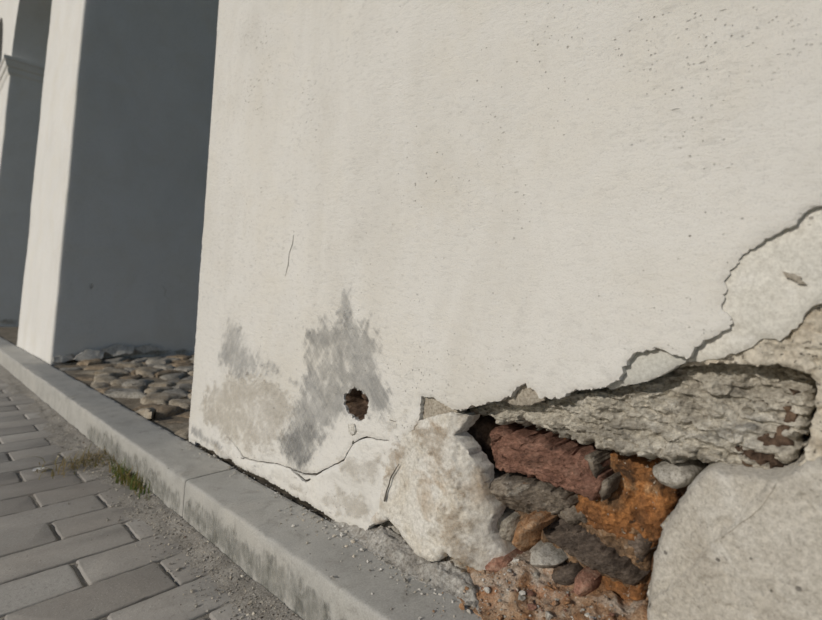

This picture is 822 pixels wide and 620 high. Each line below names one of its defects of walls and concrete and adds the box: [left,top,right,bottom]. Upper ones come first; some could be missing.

spalling [370,207,822,601]
crack [237,436,387,482]
crack [384,464,399,502]